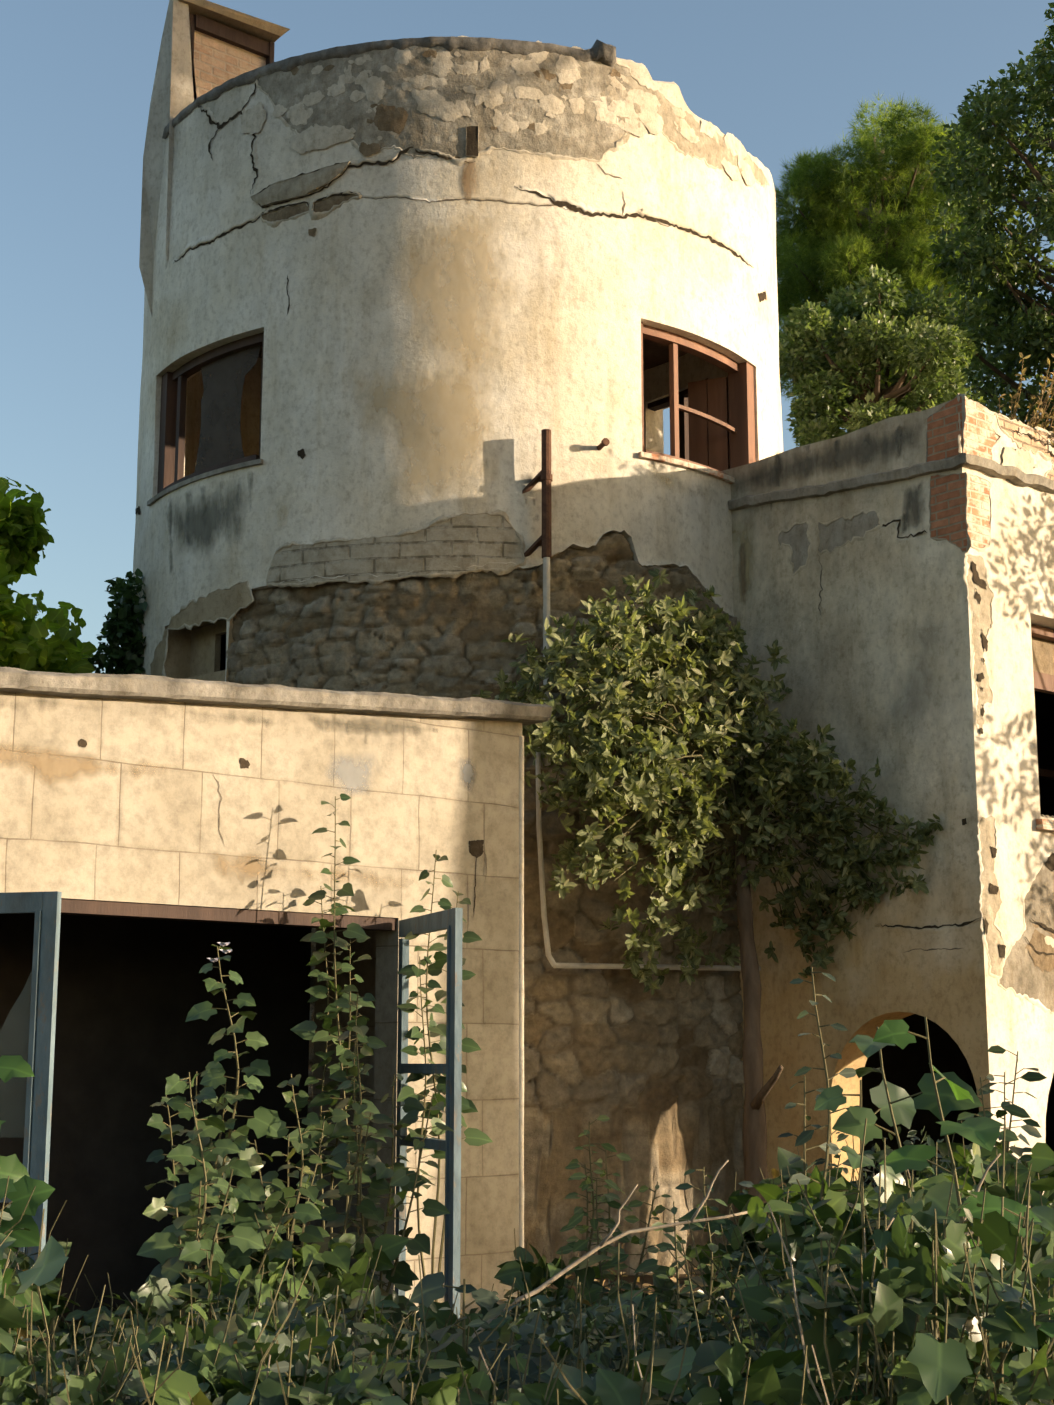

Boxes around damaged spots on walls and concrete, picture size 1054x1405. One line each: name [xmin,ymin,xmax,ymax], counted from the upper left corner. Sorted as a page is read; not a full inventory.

peeling [240,36,770,187]
crack [173,79,266,264]
crack [347,131,754,268]
leakage [750,426,912,485]
leakage [170,492,238,545]
peeling [777,509,884,576]
peeling [150,580,254,677]
crack [875,917,985,953]
peeling [961,814,1054,1014]